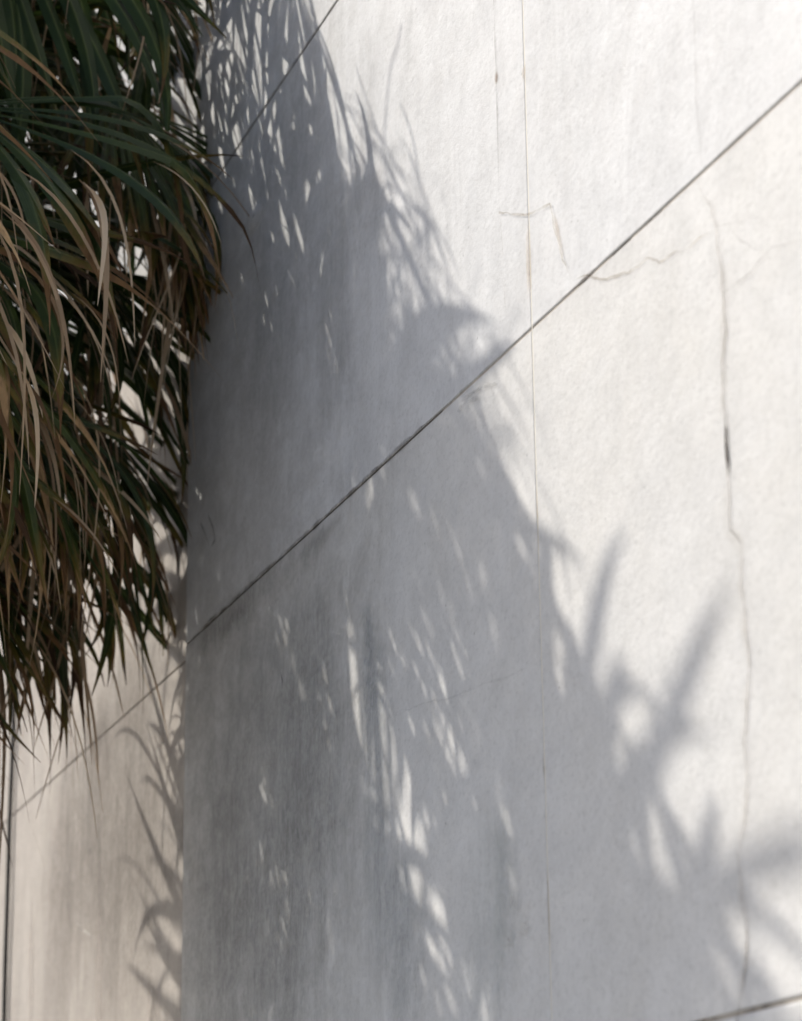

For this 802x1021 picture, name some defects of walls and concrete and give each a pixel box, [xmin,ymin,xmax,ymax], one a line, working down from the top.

crack [722,425,730,472]